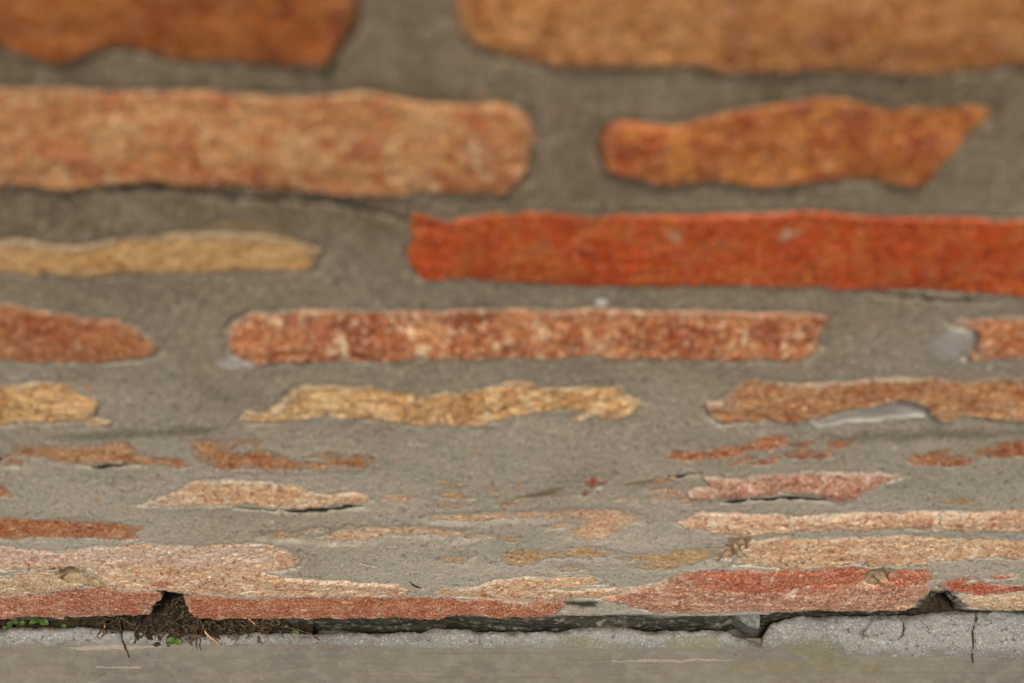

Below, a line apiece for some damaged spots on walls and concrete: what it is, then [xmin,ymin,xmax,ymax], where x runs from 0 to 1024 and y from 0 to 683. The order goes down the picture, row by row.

crack [970,614,978,663]